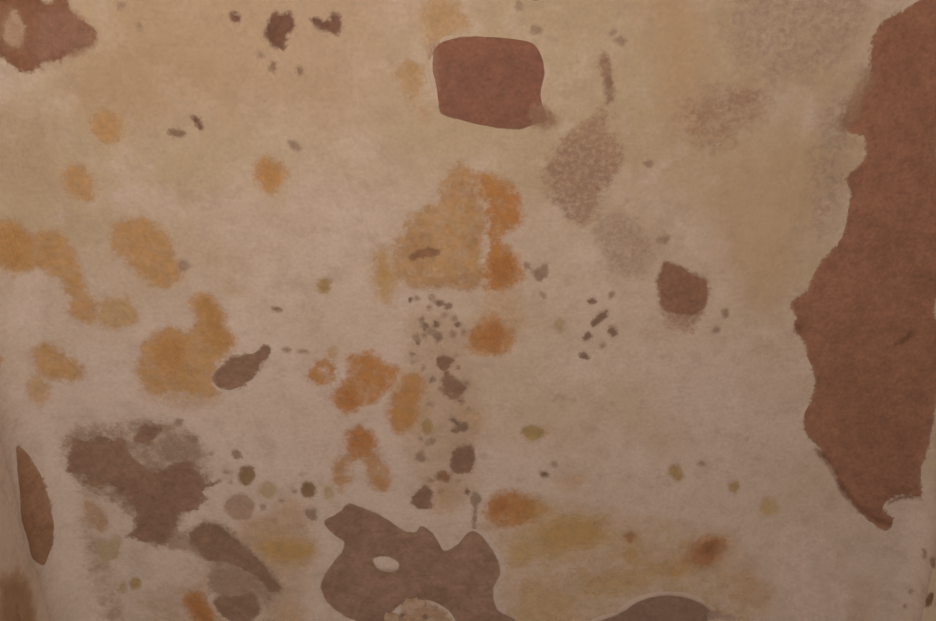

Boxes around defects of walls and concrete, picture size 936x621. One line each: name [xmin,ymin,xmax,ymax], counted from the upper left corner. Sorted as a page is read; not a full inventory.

peeling [0,0,97,73]
peeling [424,26,555,137]
peeling [656,261,711,330]
peeling [783,0,936,536]
peeling [11,438,61,572]
peeling [59,419,285,621]
peeling [293,445,523,621]
rust [488,493,548,527]
rust [184,592,224,621]
peeling [587,590,733,621]